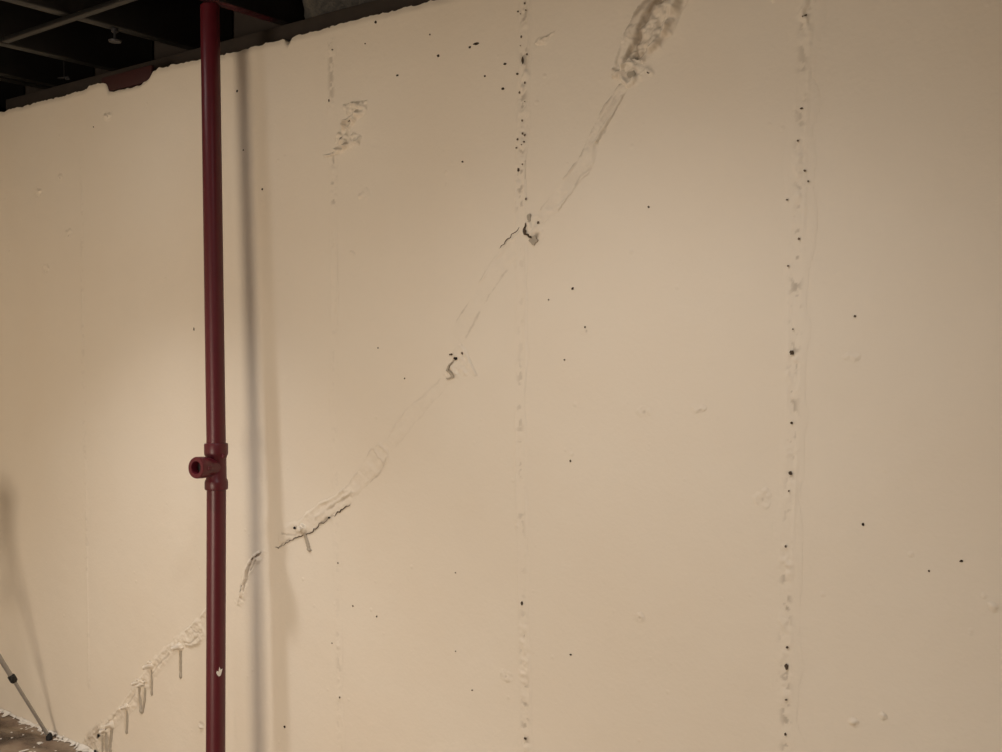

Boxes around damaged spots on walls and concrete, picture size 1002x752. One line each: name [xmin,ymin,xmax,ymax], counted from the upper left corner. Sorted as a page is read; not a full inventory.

crack [451,0,689,345]
crack [235,373,454,608]
crack [82,607,206,752]